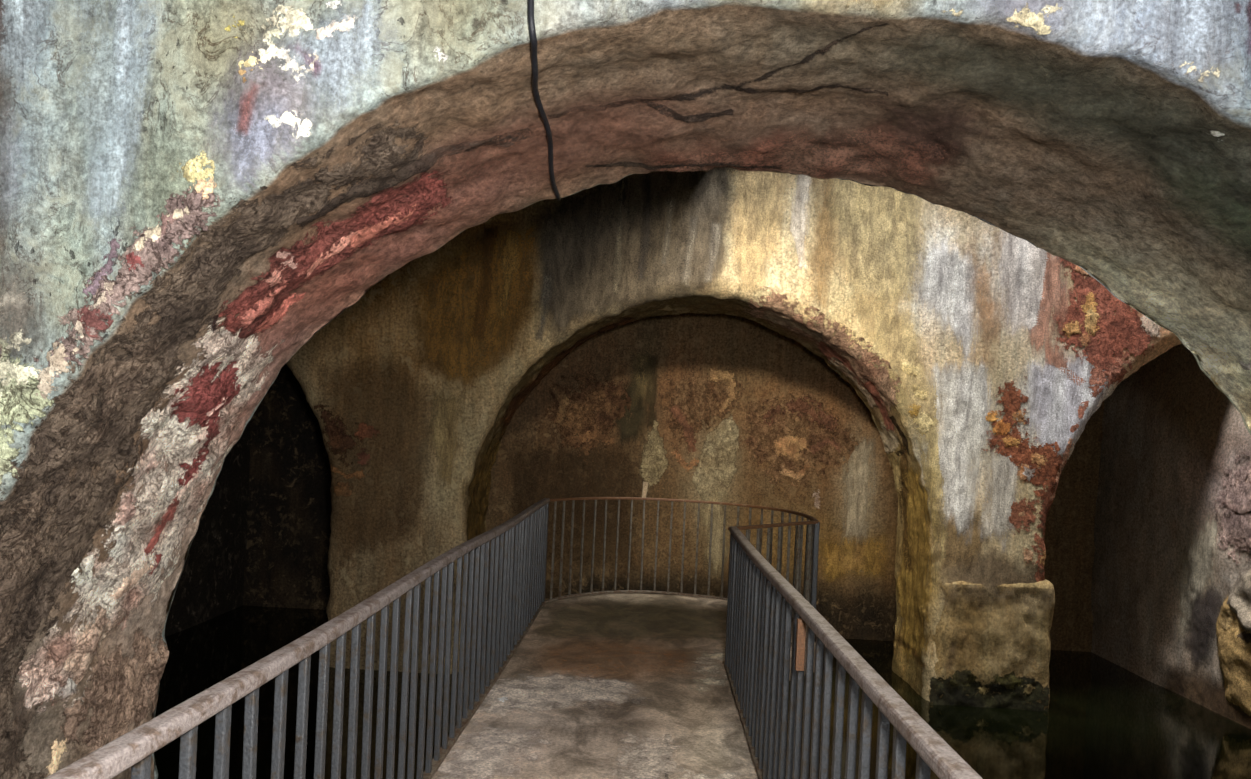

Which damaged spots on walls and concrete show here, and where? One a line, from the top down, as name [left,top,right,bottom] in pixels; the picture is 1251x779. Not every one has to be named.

peeling [239,0,356,83]
crack [548,23,888,123]
peeling [264,110,312,139]
crack [586,162,782,170]
peeling [0,120,533,779]